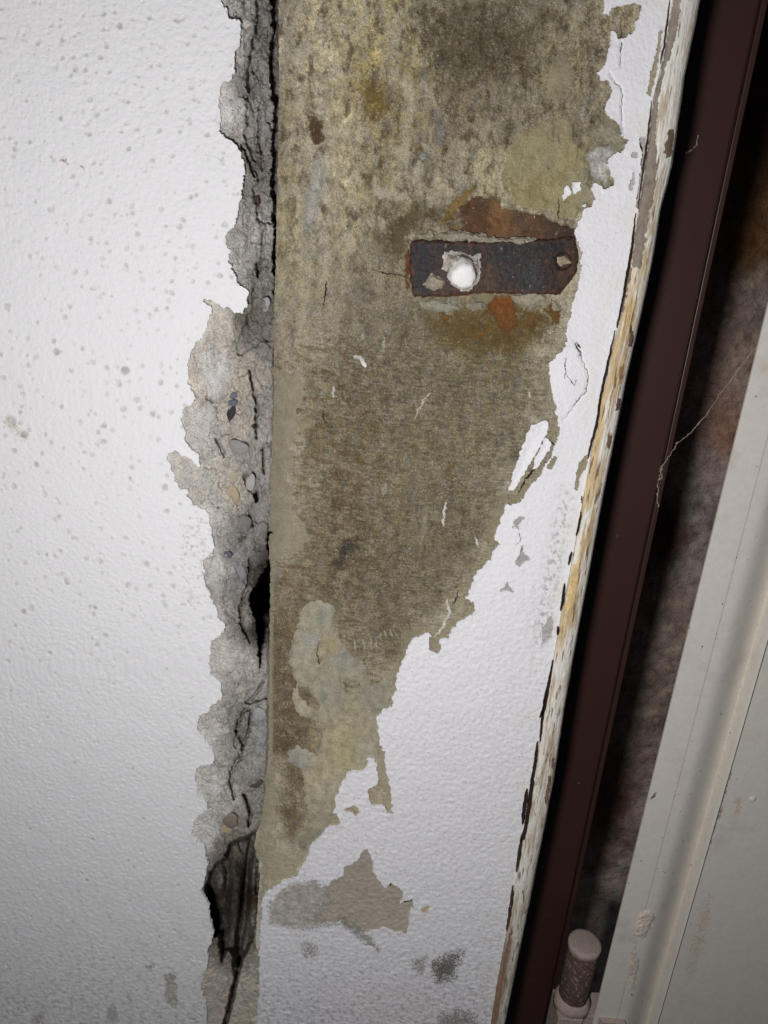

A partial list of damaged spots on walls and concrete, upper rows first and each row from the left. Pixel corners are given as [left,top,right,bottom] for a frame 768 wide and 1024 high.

water stain [399,71,417,113]
crack [241,0,279,300]
water stain [302,74,340,231]
water stain [586,123,623,185]
corrosion [441,187,574,239]
corrosion [425,296,560,355]
crack [243,370,265,526]
peeling [167,0,681,1024]
crack [238,560,251,643]
crack [228,681,268,827]
peeling [164,974,178,1008]
crack [222,956,245,1024]